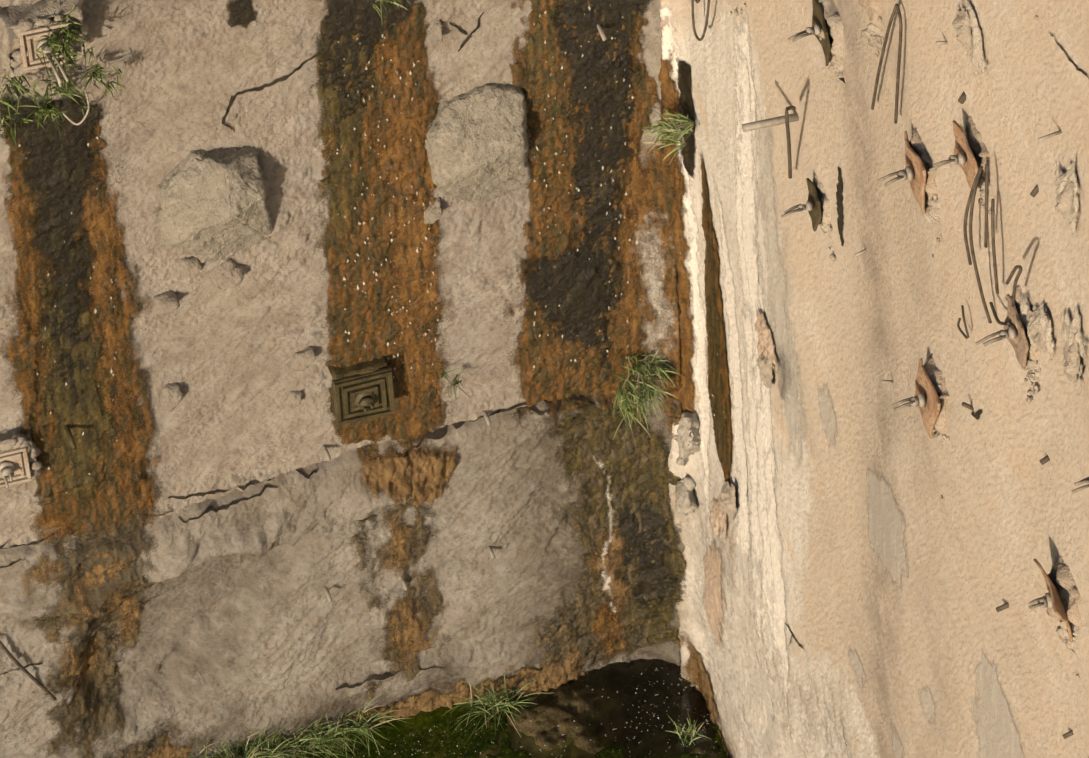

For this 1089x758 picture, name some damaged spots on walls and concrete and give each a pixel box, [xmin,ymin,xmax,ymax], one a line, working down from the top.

leakage [311,0,451,451]
crack [0,532,57,568]
leakage [0,89,164,758]
crack [145,469,317,523]
leakage [351,496,450,700]
crack [399,394,594,456]
leakage [503,0,849,758]